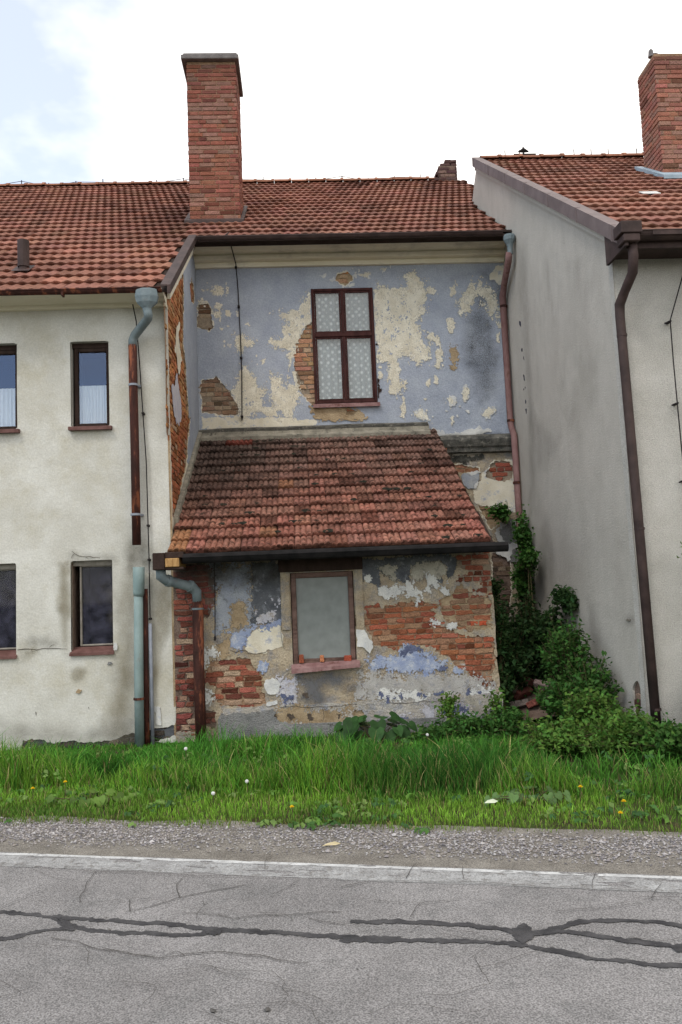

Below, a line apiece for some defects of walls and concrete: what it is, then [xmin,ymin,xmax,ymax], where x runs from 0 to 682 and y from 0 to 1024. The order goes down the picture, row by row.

peeling [163,276,368,521]
peeling [319,265,504,436]
flaking render [150,563,364,744]
flaking render [355,459,519,713]
flaking render [20,732,135,749]
crack [1,856,549,1024]
crack [559,872,681,940]